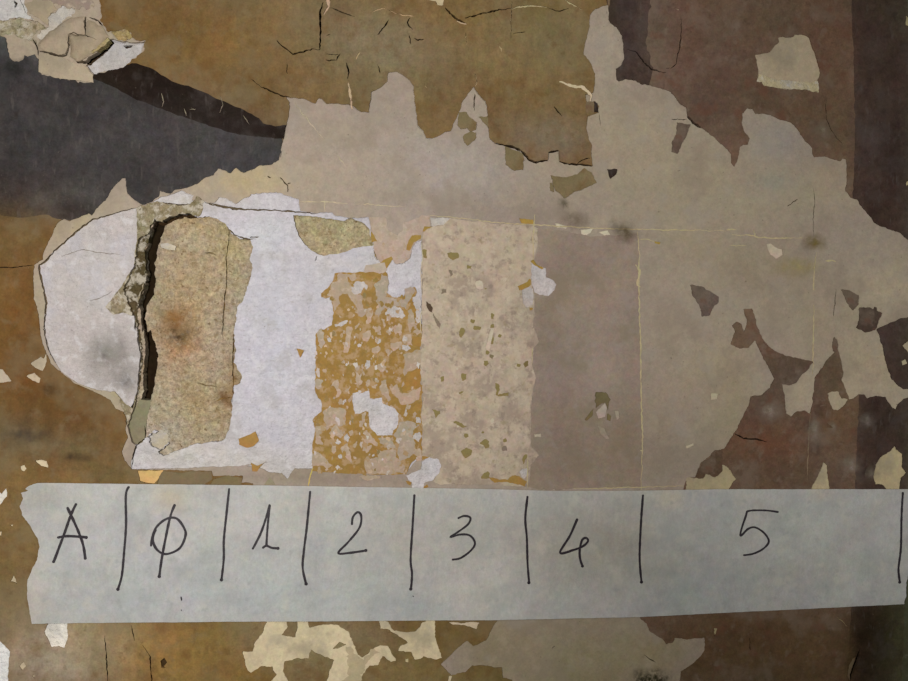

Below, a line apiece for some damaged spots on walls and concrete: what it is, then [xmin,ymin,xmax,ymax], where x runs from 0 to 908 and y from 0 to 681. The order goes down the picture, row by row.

flaking render [0,0,145,83]
crack [319,0,353,109]
crack [506,146,591,167]
peeling [27,5,908,491]
crack [129,176,312,448]
peeling [243,617,705,681]